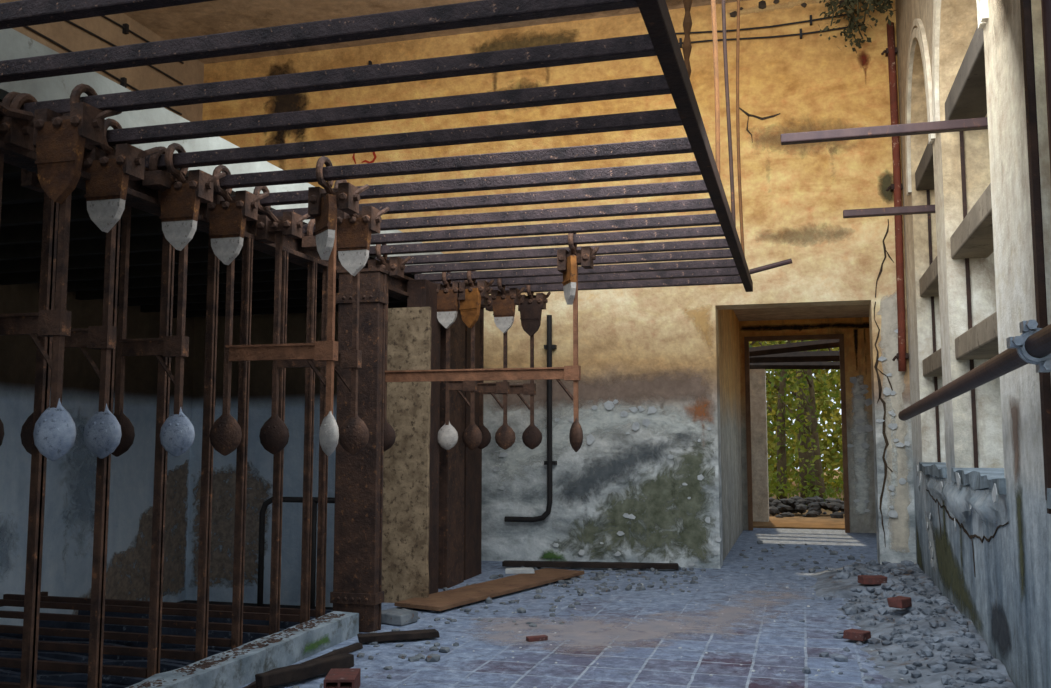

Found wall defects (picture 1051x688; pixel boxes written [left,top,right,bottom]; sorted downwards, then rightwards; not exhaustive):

water stain [270,63,291,76]
water stain [269,93,307,114]
crack [874,219,894,547]
water stain [68,426,96,522]
flaking render [105,460,189,601]
water stain [553,433,721,567]
water stain [933,500,981,629]
crack [926,489,1009,575]